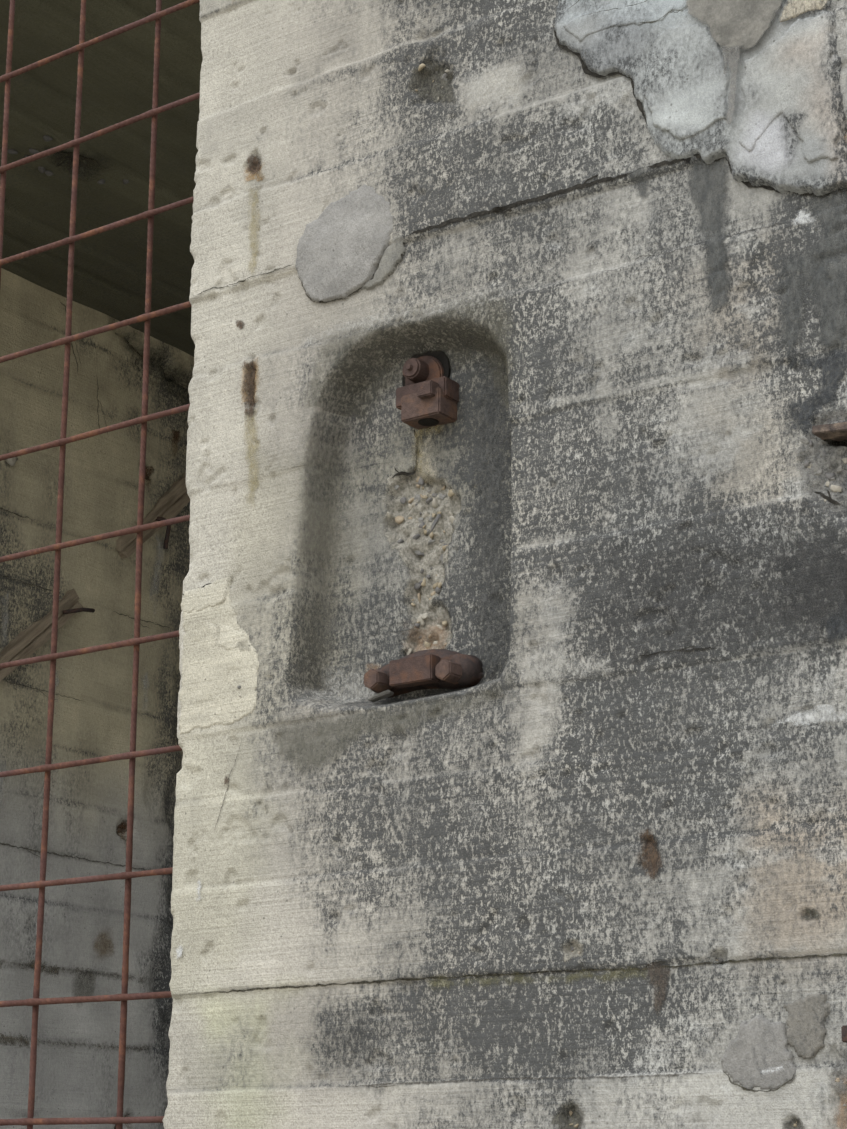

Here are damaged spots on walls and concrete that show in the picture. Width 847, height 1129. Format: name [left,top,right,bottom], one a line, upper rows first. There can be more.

peeling [555,0,847,197]
leakage [686,0,827,124]
crack [403,154,847,237]
leakage [630,168,647,197]
rust [242,361,258,490]
spalling [384,472,461,655]
crack [180,953,847,996]